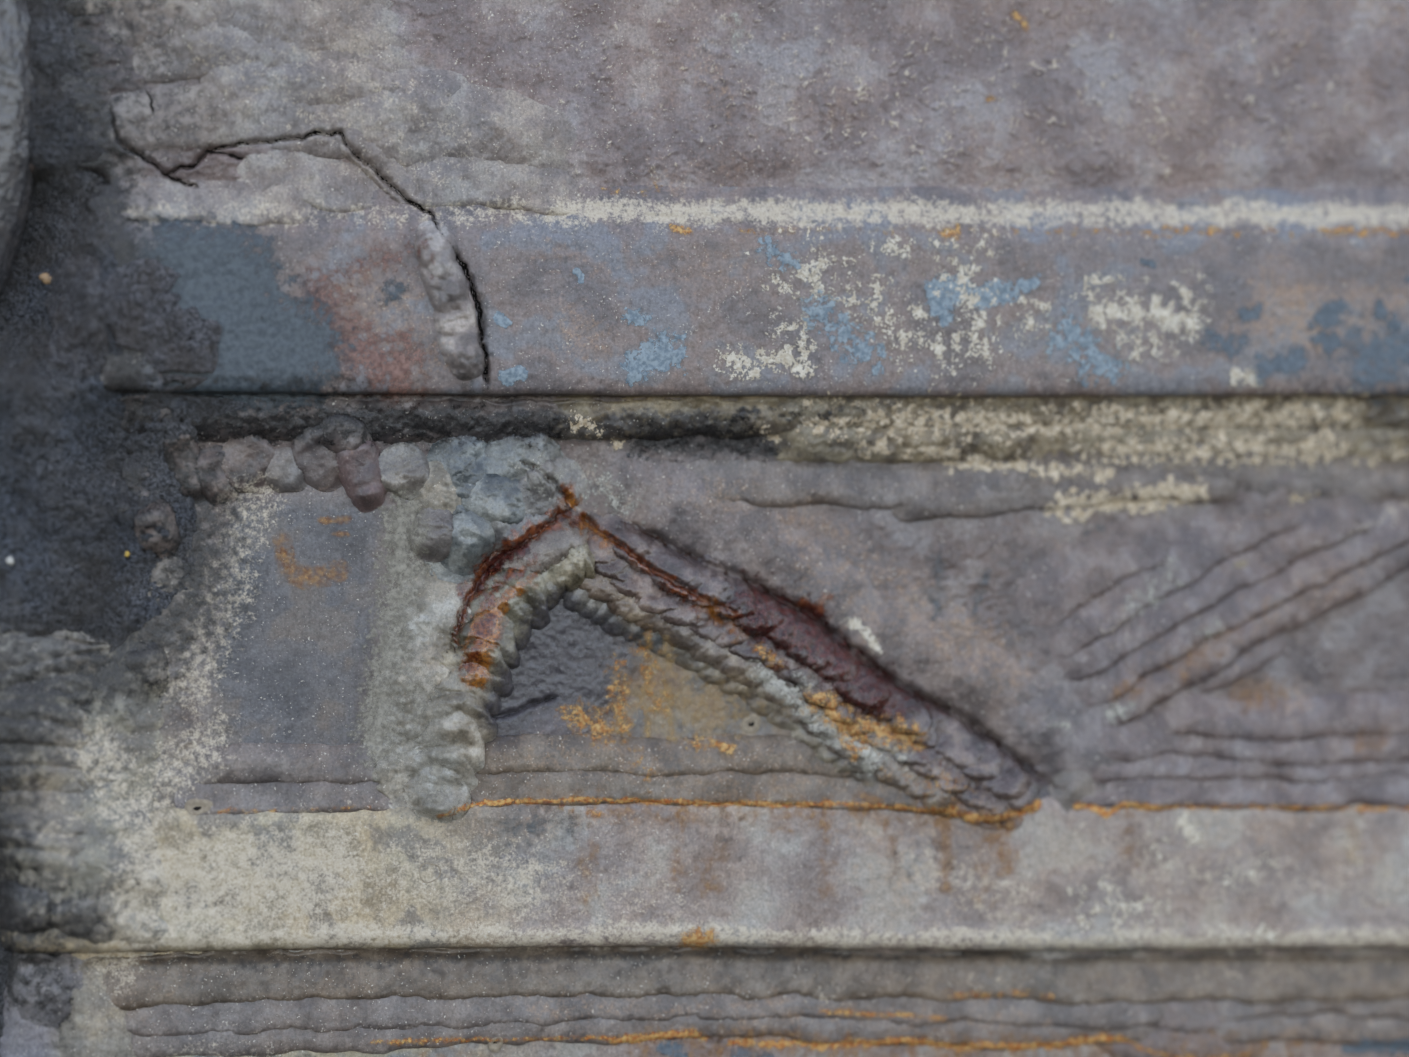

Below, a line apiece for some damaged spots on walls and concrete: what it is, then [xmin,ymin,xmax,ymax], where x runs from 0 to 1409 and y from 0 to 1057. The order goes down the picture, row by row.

crack [108,102,489,389]
rust [298,234,434,403]
peeling [498,365,529,387]
peeling [619,307,688,387]
peeling [713,211,1409,408]
rust [437,482,1041,869]
rust [1073,801,1409,819]
rust [371,1028,709,1045]
rust [726,1033,1191,1057]